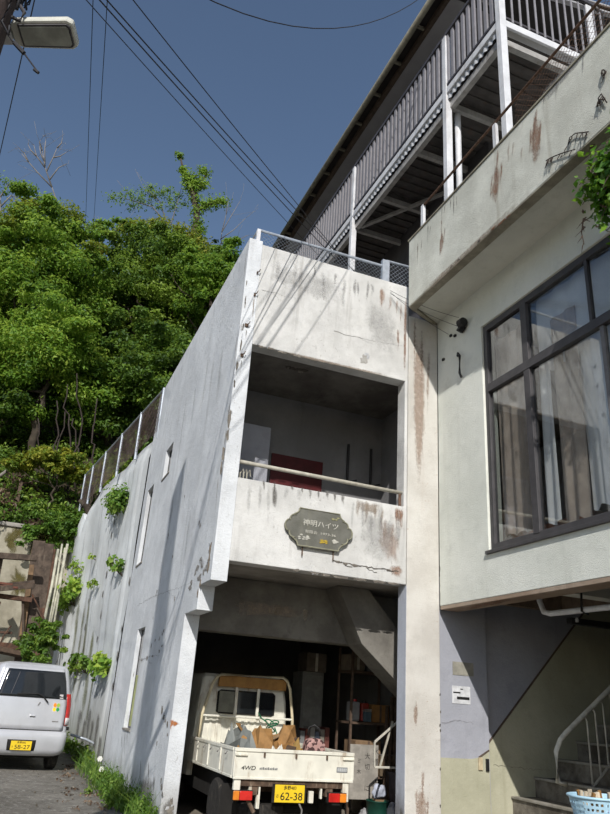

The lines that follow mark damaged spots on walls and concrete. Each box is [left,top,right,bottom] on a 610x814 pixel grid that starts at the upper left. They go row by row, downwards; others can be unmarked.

corrosion [530,113,541,159]
corrosion [490,151,502,196]
spalling [220,405,233,474]
peeling [188,542,212,597]
crack [333,560,399,573]